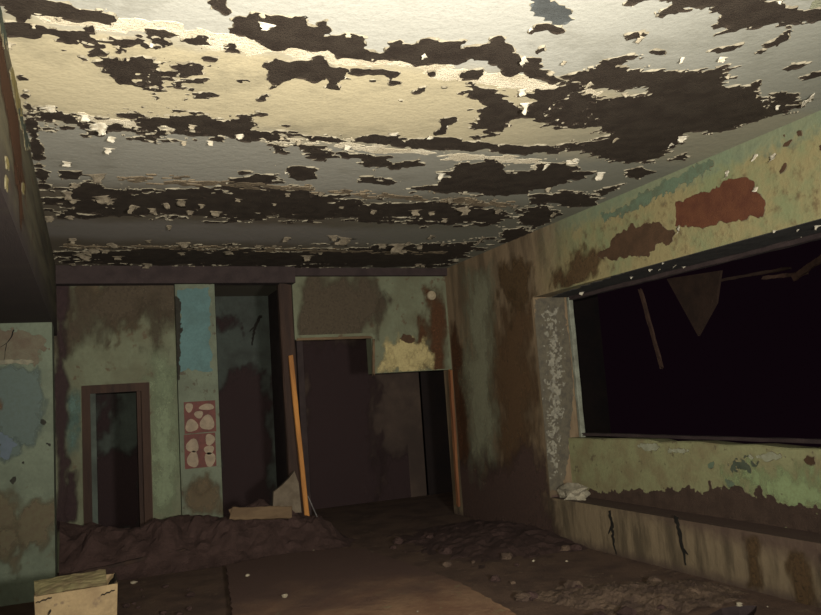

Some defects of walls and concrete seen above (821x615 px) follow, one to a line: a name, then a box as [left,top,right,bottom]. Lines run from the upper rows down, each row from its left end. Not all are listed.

peeling [0,0,821,491]
crack [608,510,617,555]
crack [674,515,688,565]
peeling [588,451,821,533]